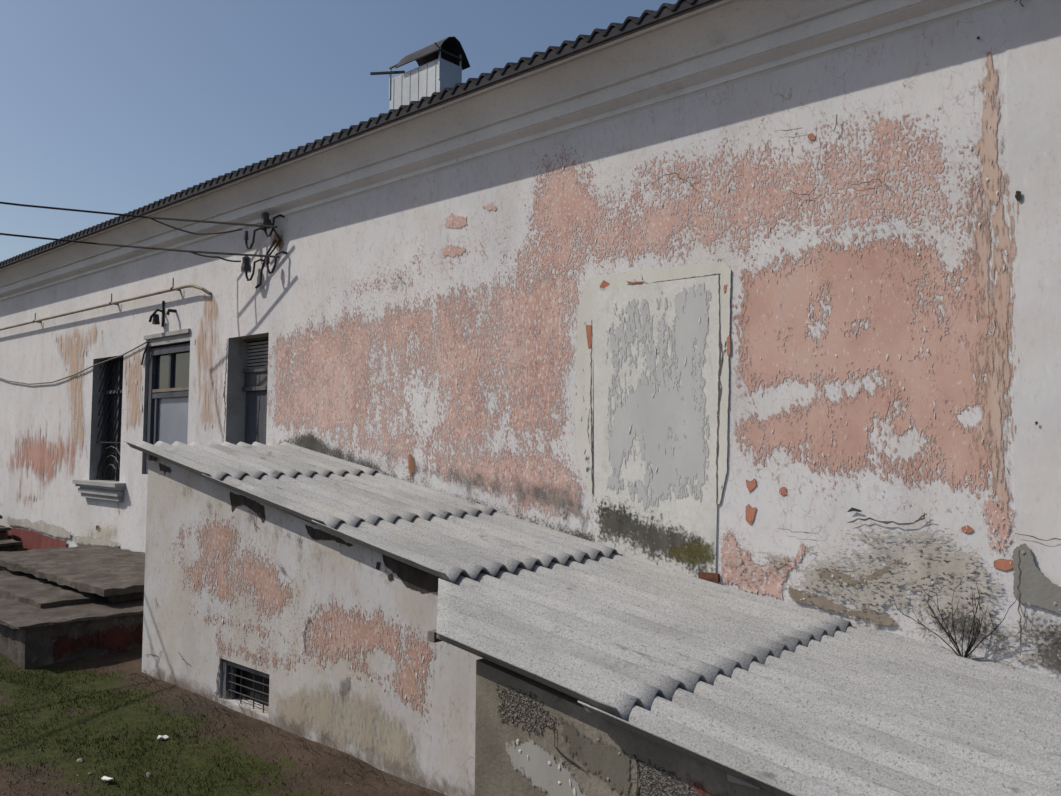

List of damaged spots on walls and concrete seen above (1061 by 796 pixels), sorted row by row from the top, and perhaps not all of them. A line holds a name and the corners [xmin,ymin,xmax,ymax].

peeling [194,297,222,430]
peeling [265,51,1061,670]
peeling [7,327,118,547]
leakage [279,430,716,583]
crack [847,512,938,527]
peeling [168,492,448,721]
leakage [918,606,1007,649]
leakage [1020,612,1061,675]
peeling [496,683,587,796]
crack [554,726,588,775]
flaking render [635,758,699,796]